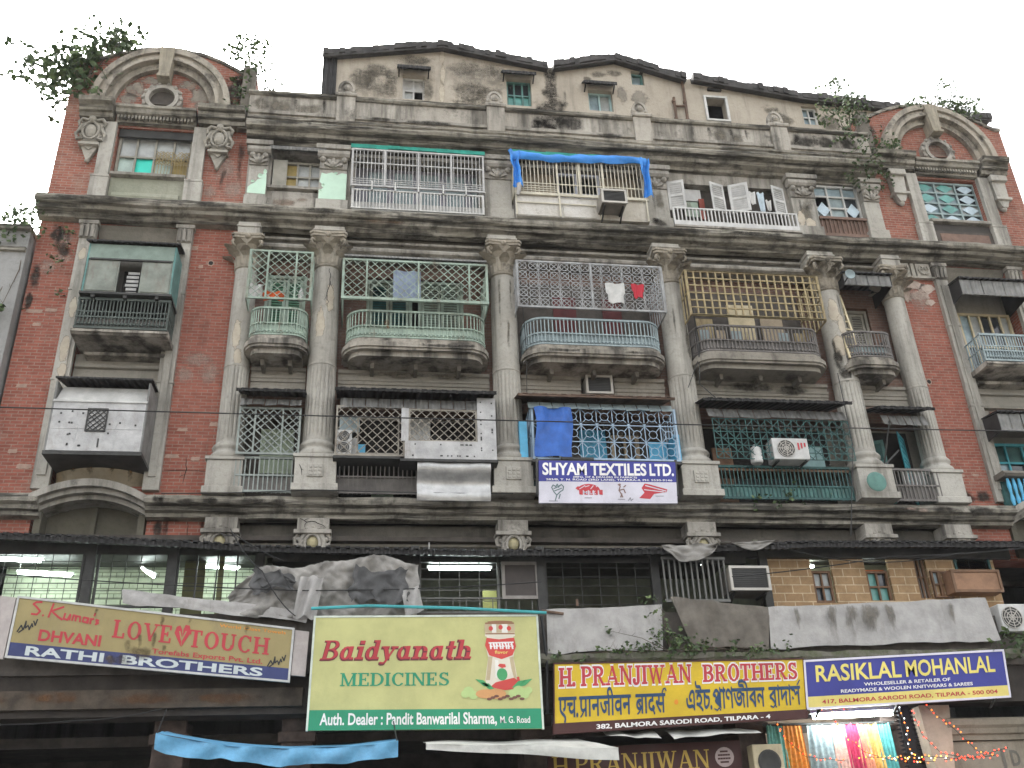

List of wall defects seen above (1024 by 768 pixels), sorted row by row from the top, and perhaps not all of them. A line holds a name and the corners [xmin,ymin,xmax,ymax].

leakage [352,65,396,96]
leakage [450,62,500,105]
leakage [532,69,582,134]
peeling [247,169,267,194]
peeling [318,172,347,200]
leakage [25,225,70,309]
peeling [904,281,936,310]
leakage [828,605,895,629]